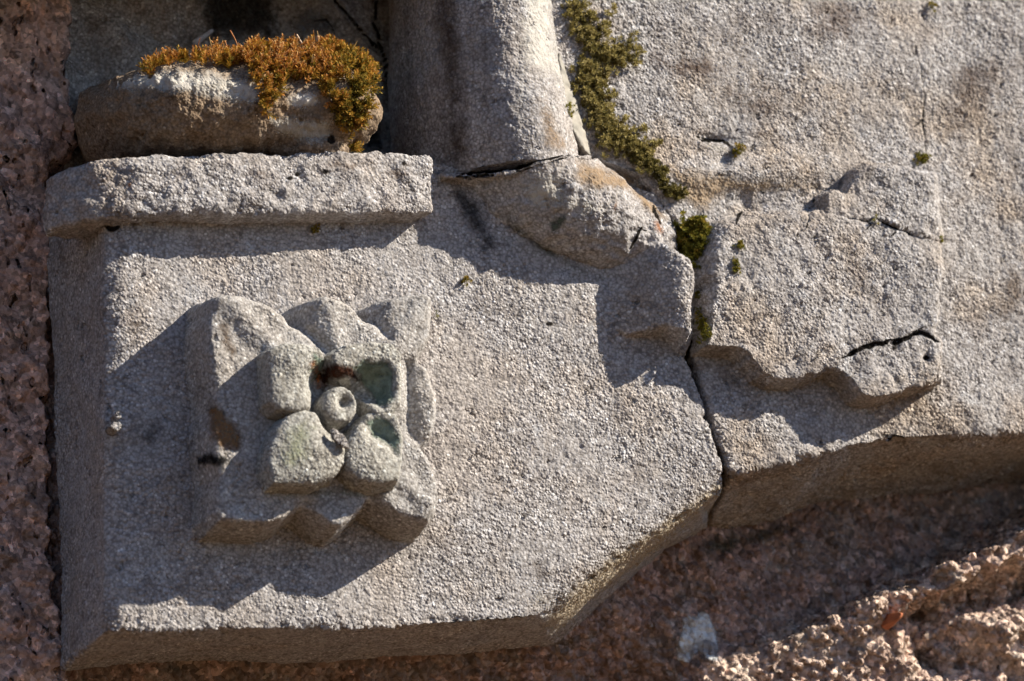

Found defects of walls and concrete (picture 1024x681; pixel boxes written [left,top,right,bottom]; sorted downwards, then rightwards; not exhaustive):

crack [462,155,566,175]
crack [860,220,913,237]
crack [842,326,939,358]